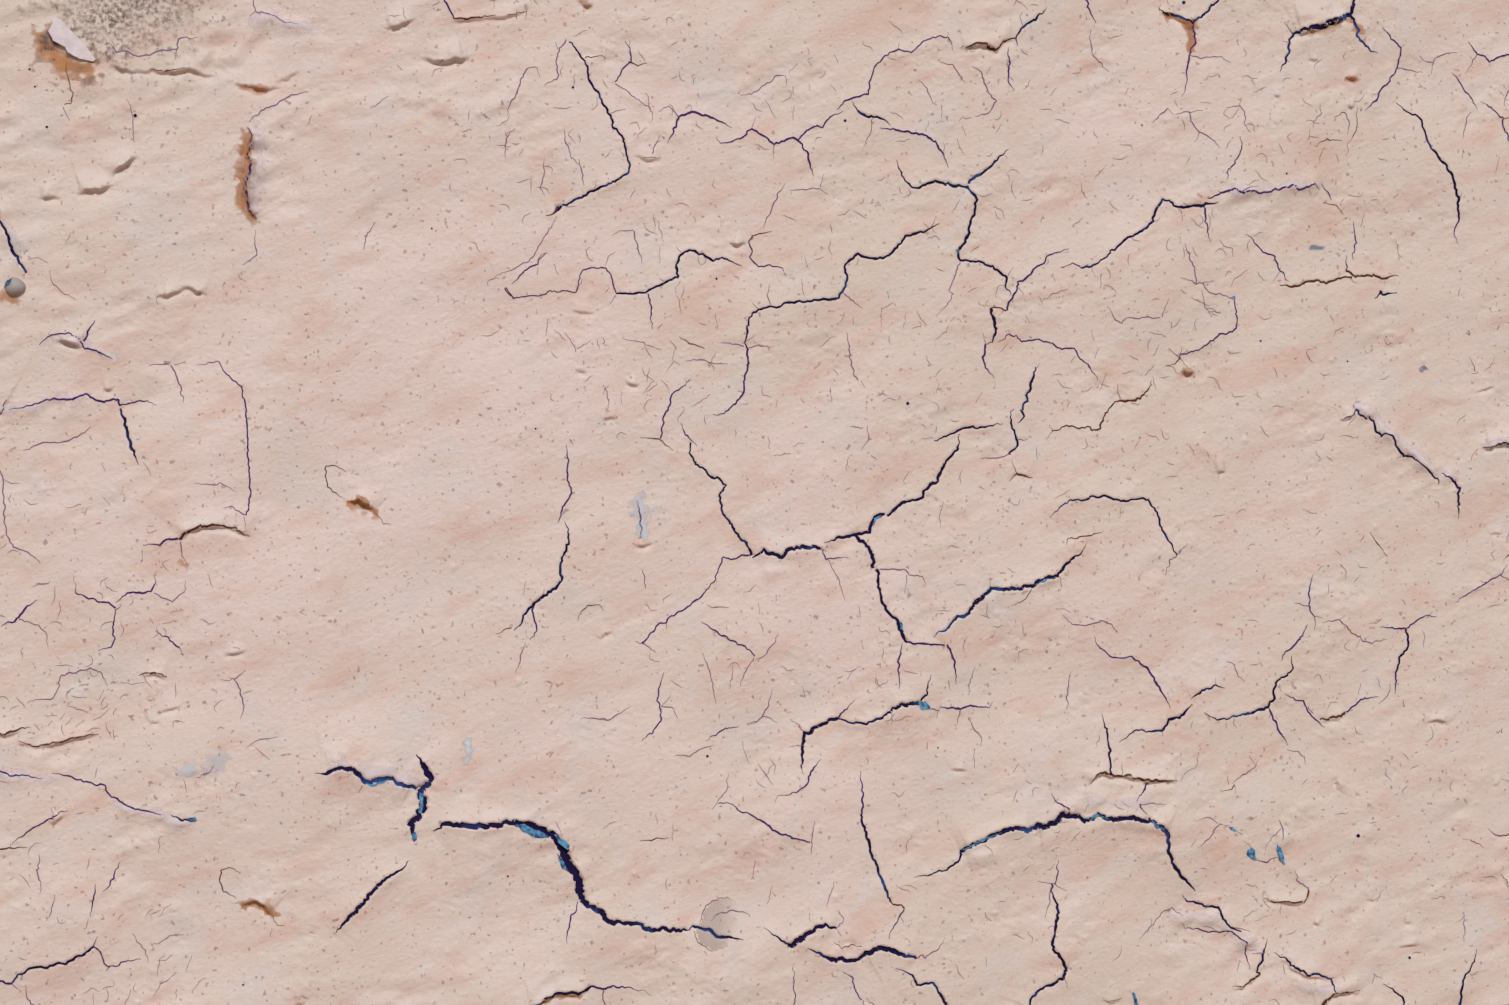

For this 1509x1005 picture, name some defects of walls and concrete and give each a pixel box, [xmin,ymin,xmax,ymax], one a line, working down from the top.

crack [107,36,198,60]
peeling [28,4,281,200]
crack [236,91,321,282]
crack [249,0,320,42]
crack [318,0,1509,1005]
crack [0,203,275,1005]